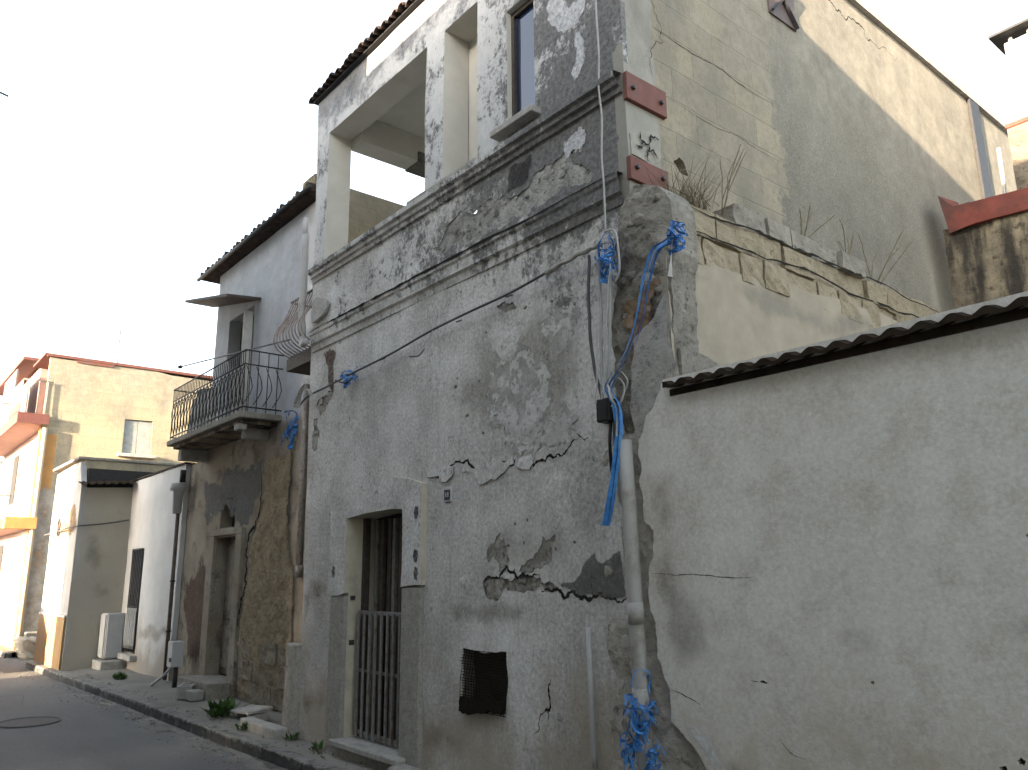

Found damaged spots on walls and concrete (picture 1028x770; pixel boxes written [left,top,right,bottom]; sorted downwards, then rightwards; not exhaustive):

crack [829,0,896,61]
spalling [601,184,707,770]
spalling [482,519,569,601]
crack [653,571,750,579]
crack [534,679,551,734]